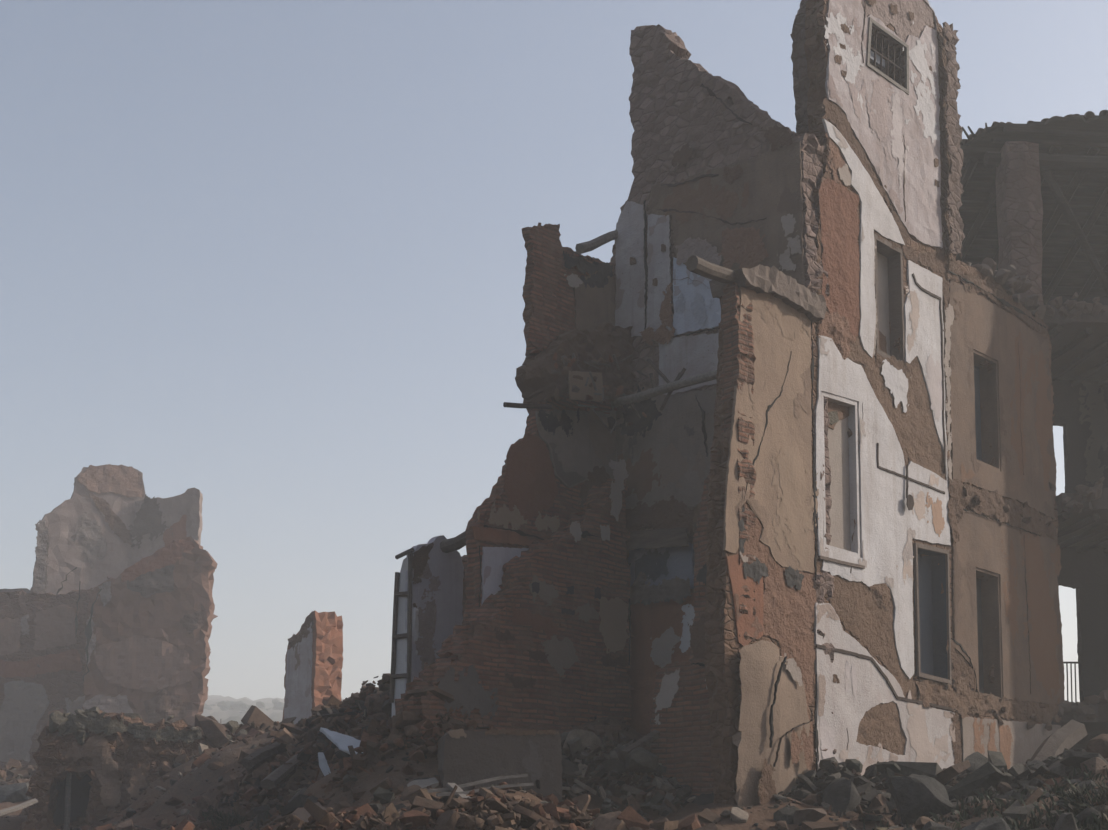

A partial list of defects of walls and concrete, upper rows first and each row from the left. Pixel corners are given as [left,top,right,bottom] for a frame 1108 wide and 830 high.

spalling [761,125,793,151]
peeling [824,12,866,110]
spalling [861,0,940,143]
spalling [819,98,1058,547]
crack [744,320,817,580]
peeling [650,604,695,725]
crack [769,656,819,771]
spalling [737,502,1061,770]